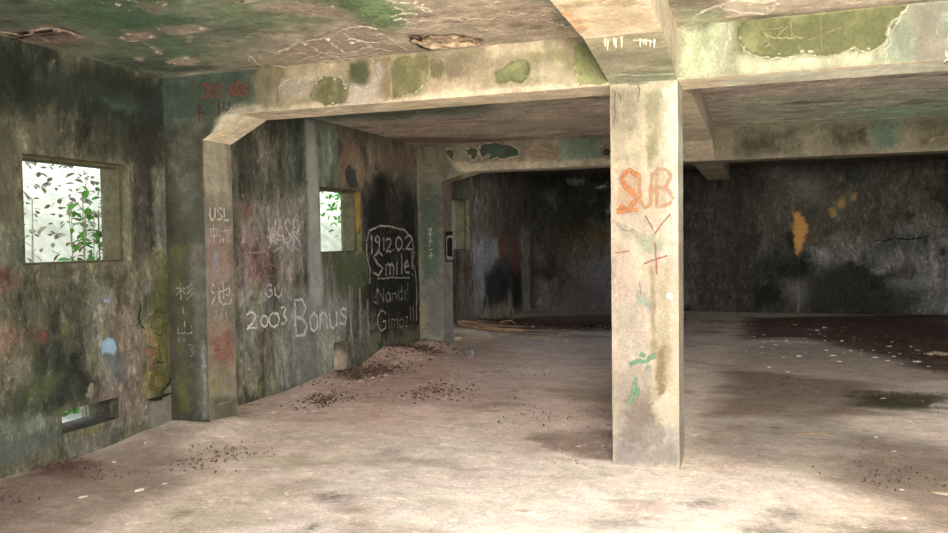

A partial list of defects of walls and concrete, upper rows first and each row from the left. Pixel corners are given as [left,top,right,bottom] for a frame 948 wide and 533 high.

spalling [2,28,78,44]
peeling [738,6,908,61]
peeling [248,0,481,106]
peeling [494,59,530,84]
peeling [444,141,560,162]
crack [873,234,928,242]